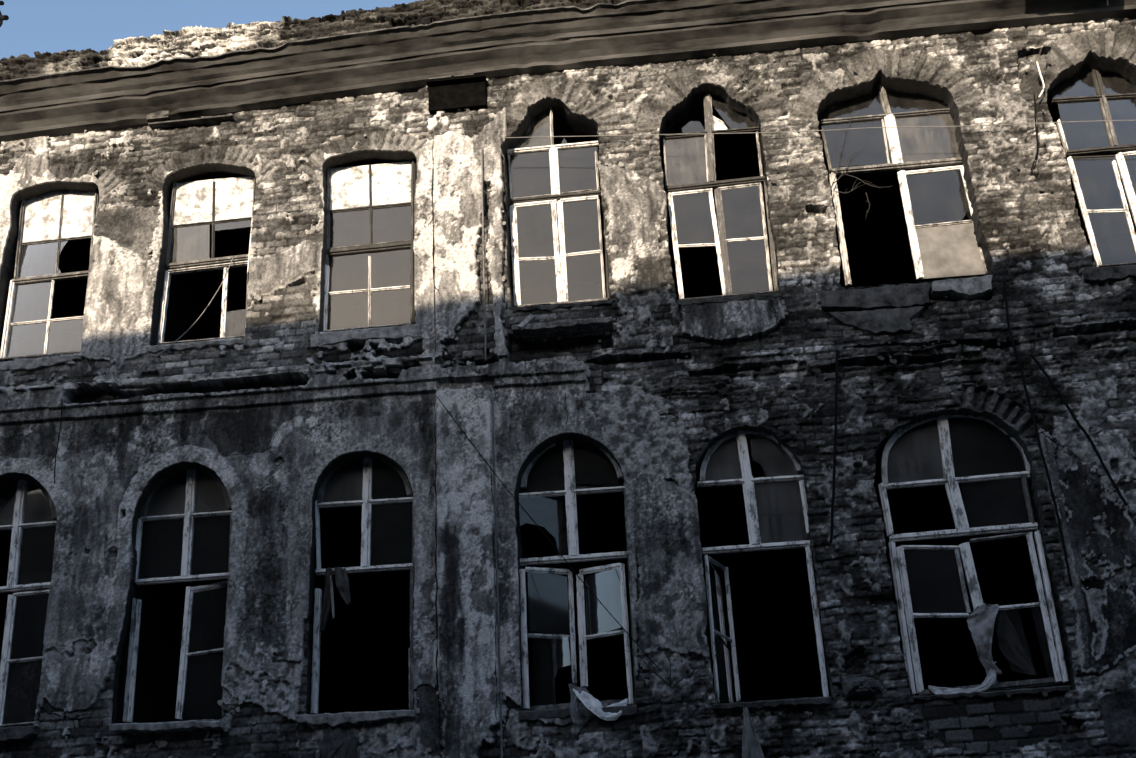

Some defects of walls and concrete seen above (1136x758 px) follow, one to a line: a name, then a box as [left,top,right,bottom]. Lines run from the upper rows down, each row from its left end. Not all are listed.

peeling [46,77,510,260]
peeling [0,270,425,404]
peeling [436,180,499,369]
spalling [501,18,1136,758]
peeling [0,618,324,758]
peeling [344,683,446,758]
water stain [440,525,463,746]
peeling [473,692,583,758]